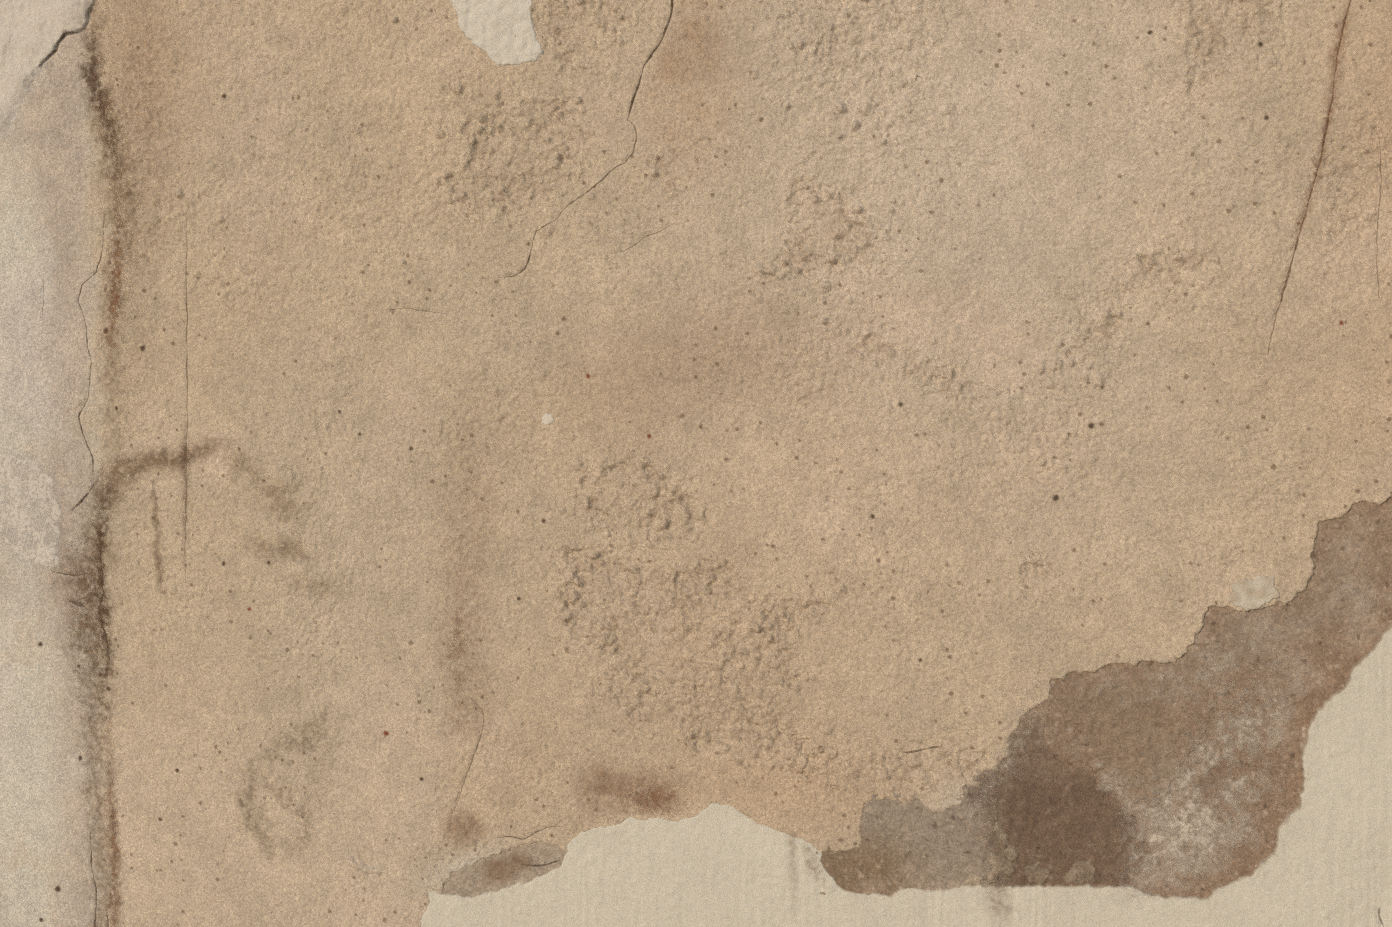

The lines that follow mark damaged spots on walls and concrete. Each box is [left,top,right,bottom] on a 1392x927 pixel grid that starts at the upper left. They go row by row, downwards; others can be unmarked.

leakage [86,60,122,180]
flaking render [431,69,596,235]
crack [510,0,673,277]
leakage [96,446,209,495]
leakage [77,530,113,721]
peeling [546,444,1392,898]
leakage [110,811,118,921]
peeling [443,842,567,898]